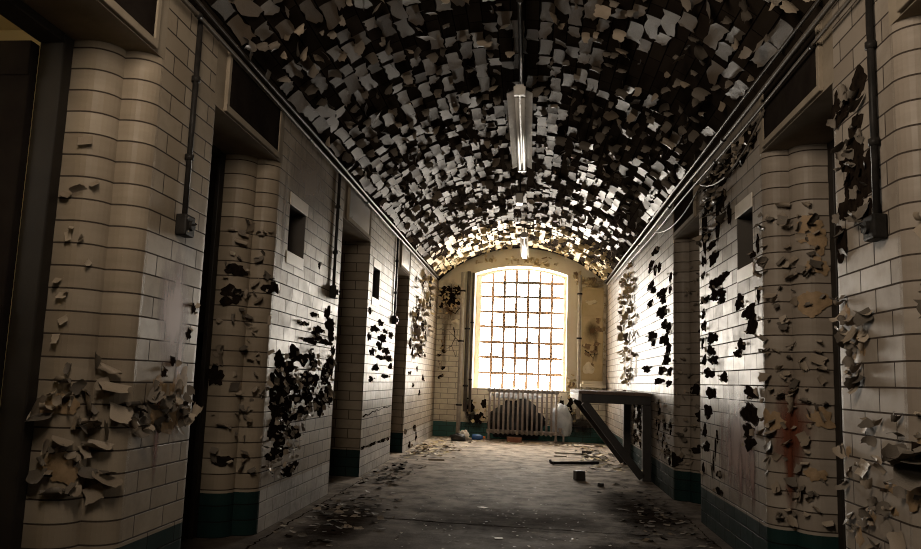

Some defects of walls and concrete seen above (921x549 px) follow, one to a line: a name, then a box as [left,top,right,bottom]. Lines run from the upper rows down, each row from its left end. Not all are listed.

peeling [59,180,100,198]
peeling [26,219,337,506]
peeling [211,0,921,549]